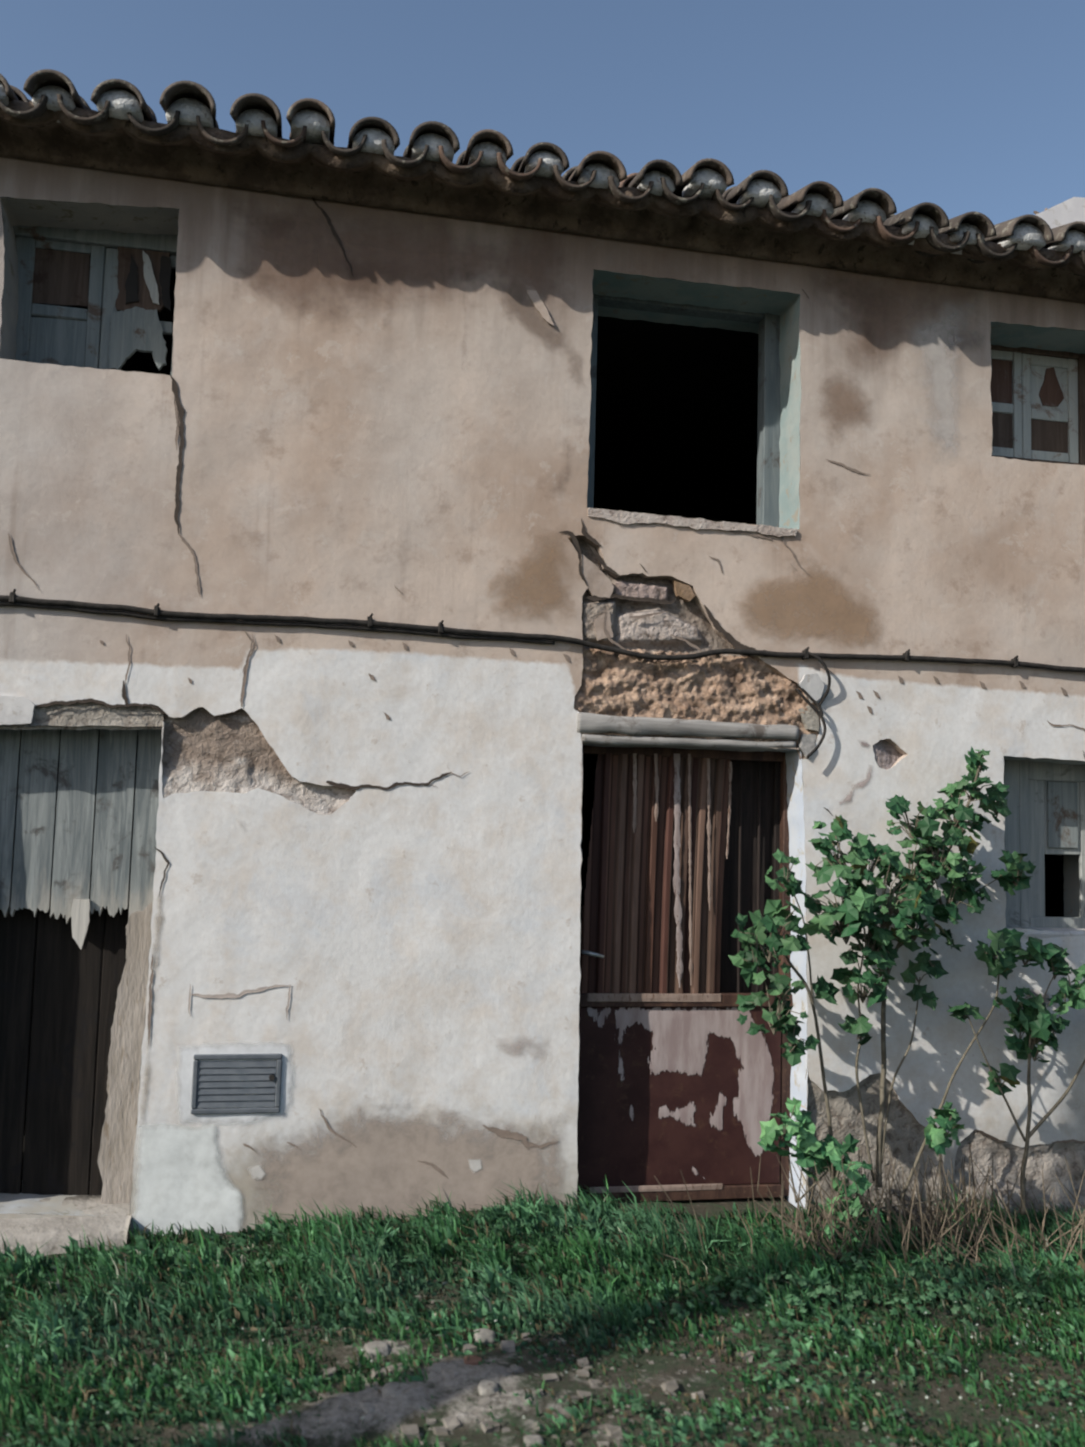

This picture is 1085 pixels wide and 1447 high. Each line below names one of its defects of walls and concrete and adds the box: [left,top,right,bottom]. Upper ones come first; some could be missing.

crack [170,375,201,596]
damp [505,546,561,613]
damp [745,574,871,644]
spalling [563,538,824,759]
spalling [0,696,356,815]
crack [326,771,469,790]
spalling [840,739,902,803]
crack [1047,720,1085,758]
crack [154,847,170,897]
crack [146,954,154,1043]
crack [188,984,291,1017]
spalling [805,1069,1085,1223]